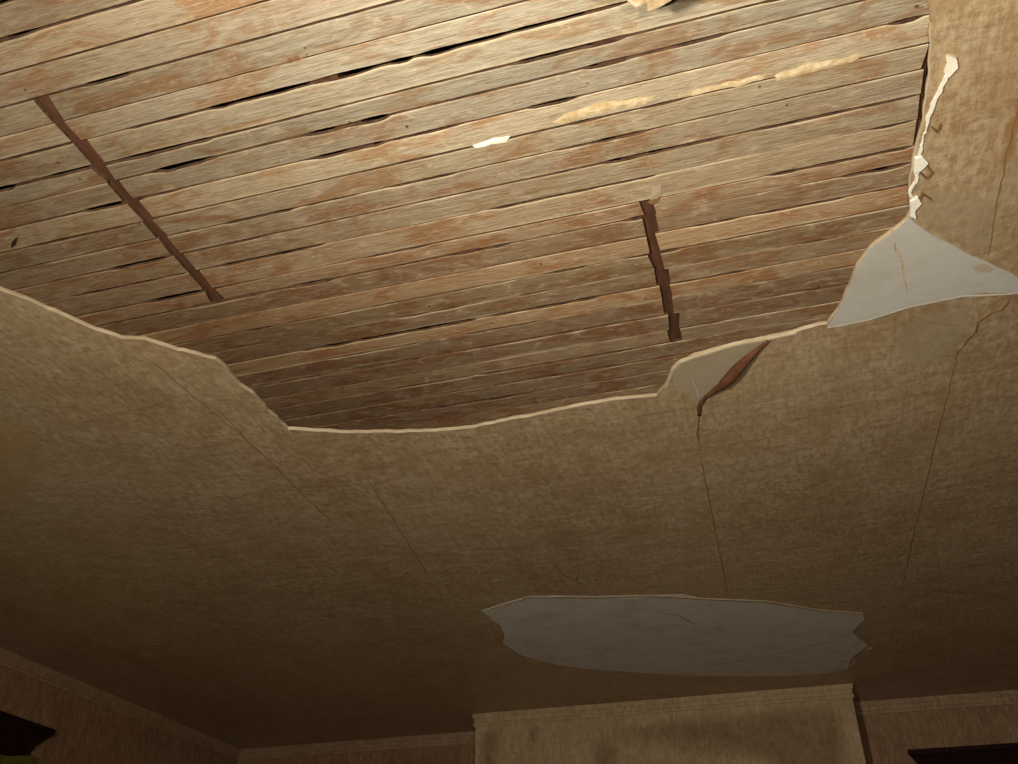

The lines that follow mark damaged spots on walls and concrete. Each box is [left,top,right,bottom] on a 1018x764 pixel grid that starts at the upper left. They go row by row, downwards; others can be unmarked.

spalling [0,0,1018,441]
crack [698,444,728,594]
peeling [481,594,872,677]